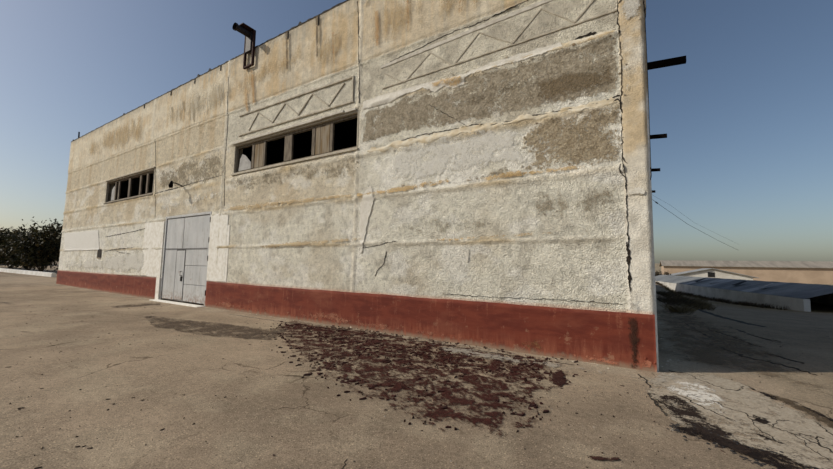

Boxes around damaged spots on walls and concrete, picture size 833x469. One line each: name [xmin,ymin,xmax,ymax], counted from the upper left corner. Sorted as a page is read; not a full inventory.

crack [354,1,362,103]
crack [401,104,513,141]
crack [390,0,528,62]
spalling [362,35,629,142]
spalling [389,107,623,187]
crack [451,0,632,305]
crack [643,0,652,180]
water stain [628,290,639,367]